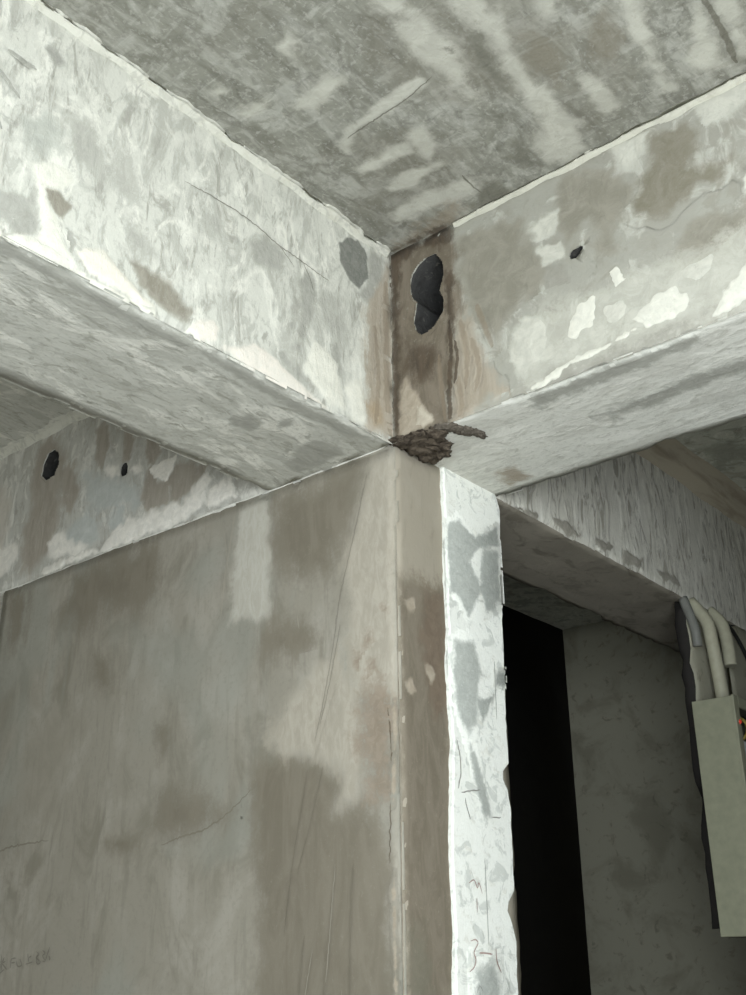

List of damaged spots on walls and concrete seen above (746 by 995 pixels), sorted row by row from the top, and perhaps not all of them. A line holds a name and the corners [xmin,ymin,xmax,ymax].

crack [185,181,329,291]
peeling [457,115,746,373]
peeling [531,286,689,390]
peeling [98,453,179,484]
spalling [388,372,488,465]
leakage [0,235,452,995]